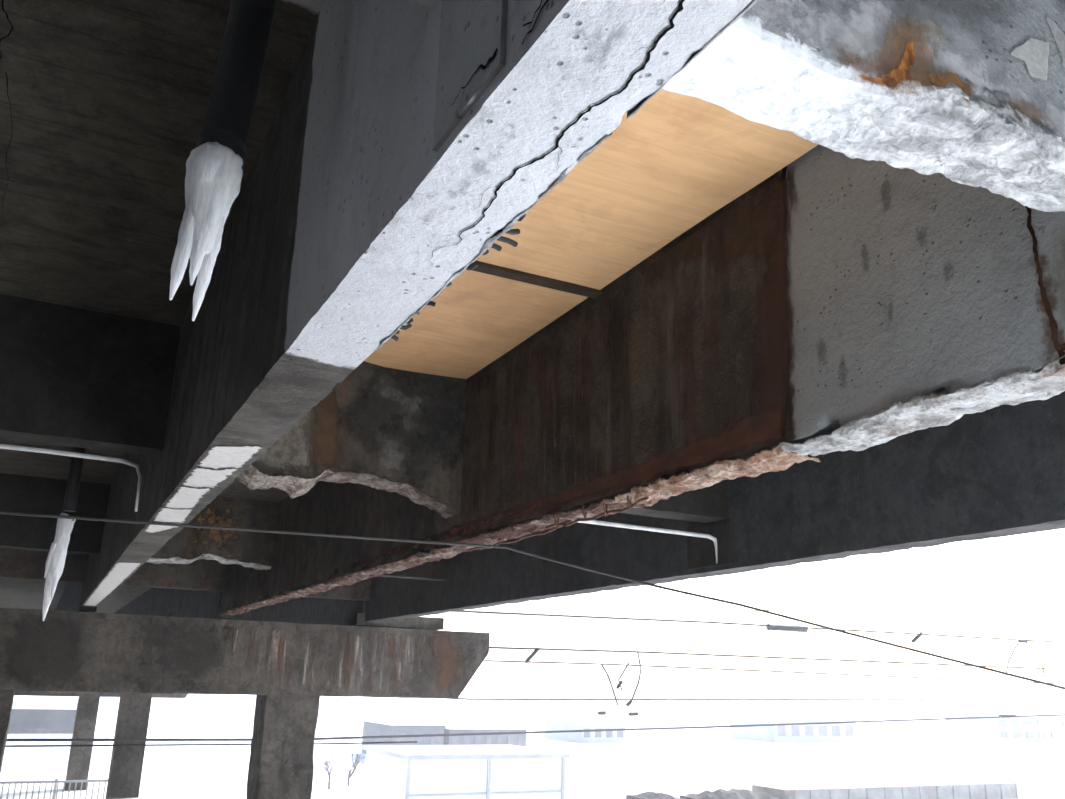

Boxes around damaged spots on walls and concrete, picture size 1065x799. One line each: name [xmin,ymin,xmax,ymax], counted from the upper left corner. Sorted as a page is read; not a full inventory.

crack [0,0,14,212]
crack [430,0,685,266]
spalling [625,0,1065,212]
rust [841,21,973,103]
rust [1011,102,1045,119]
crack [1025,206,1065,365]
peeling [84,553,272,606]
rust [184,496,254,557]
peeling [145,446,459,533]
damp [338,366,465,488]
spalling [220,355,1065,616]